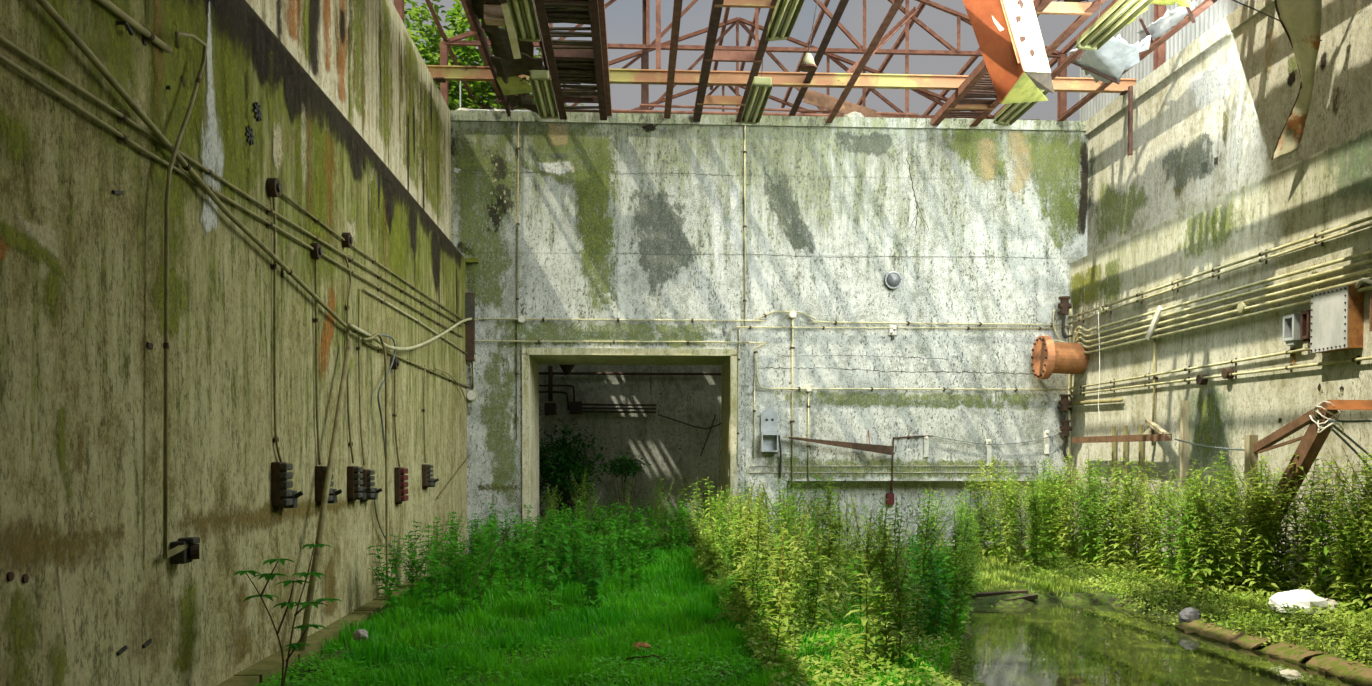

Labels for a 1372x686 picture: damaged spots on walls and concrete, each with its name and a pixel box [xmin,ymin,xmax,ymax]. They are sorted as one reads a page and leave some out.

corrosion [323,0,346,101]
damp [90,0,474,337]
corrosion [318,286,336,373]
damp [57,408,84,497]
damp [177,498,361,543]
damp [0,520,124,686]